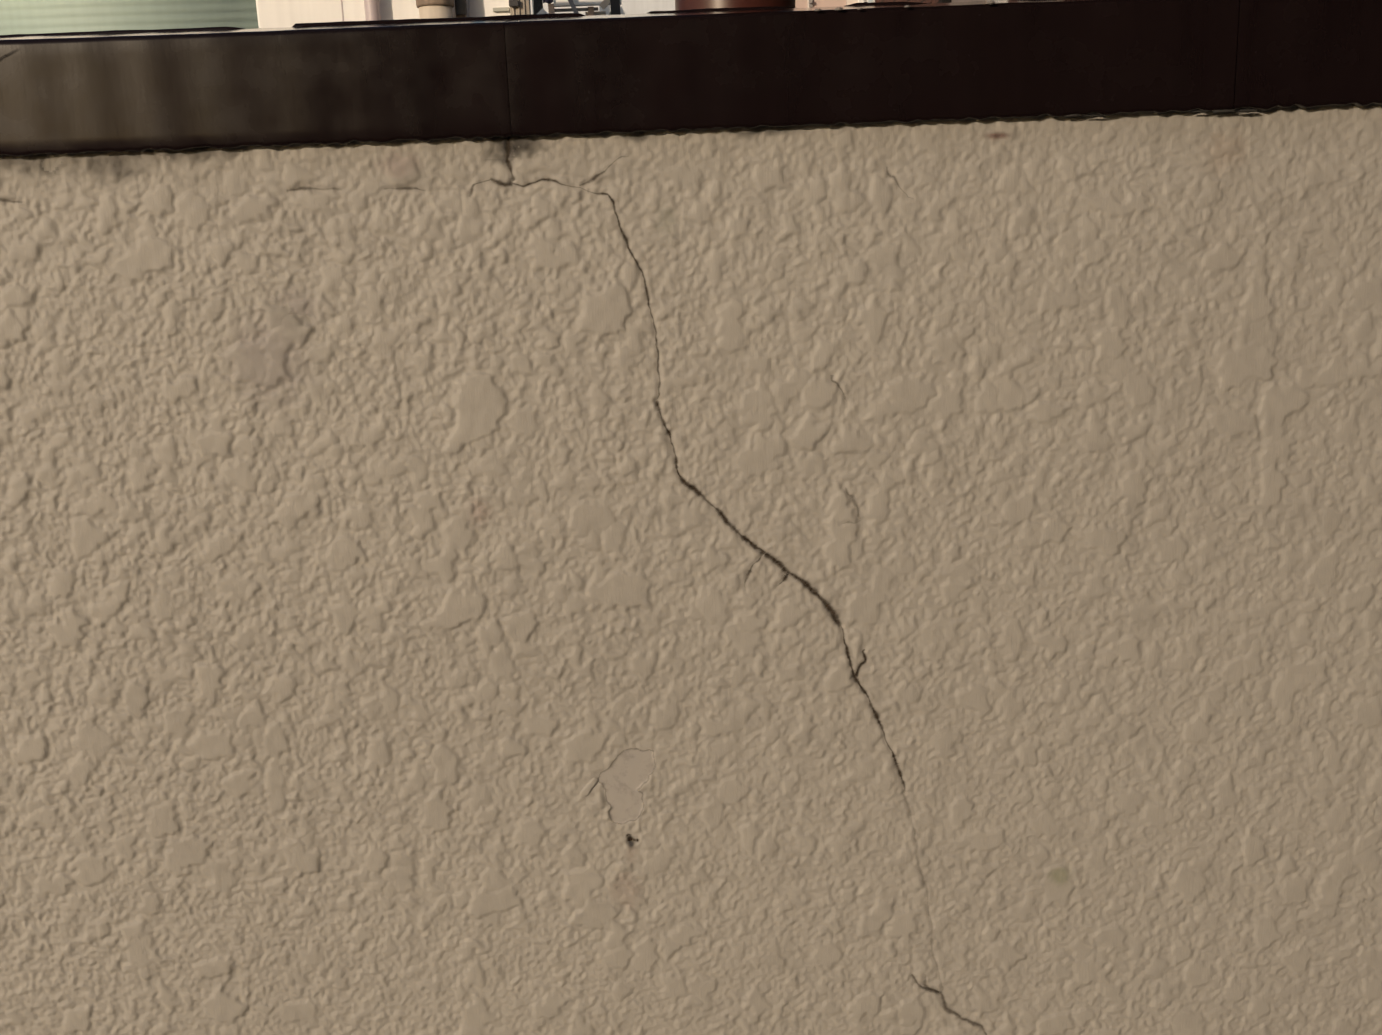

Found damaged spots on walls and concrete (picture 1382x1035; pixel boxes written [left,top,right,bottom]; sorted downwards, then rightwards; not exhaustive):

crack [471,137,905,787]
crack [912,975,983,1028]